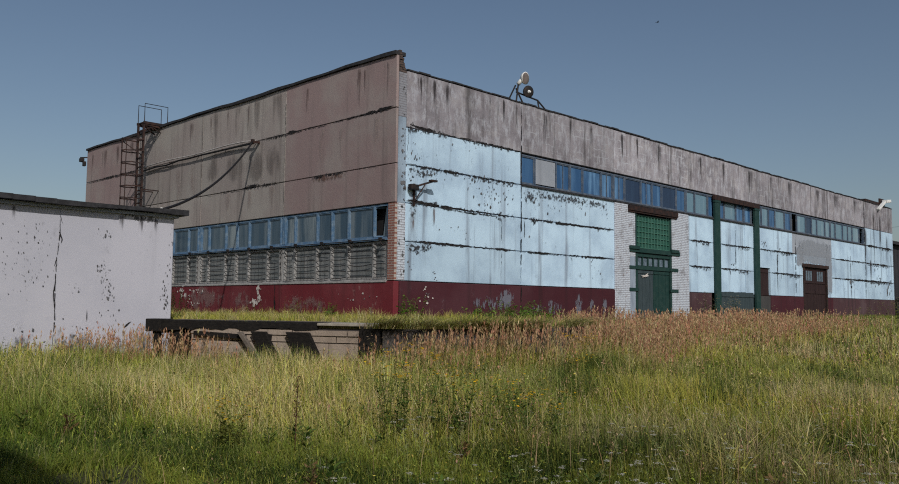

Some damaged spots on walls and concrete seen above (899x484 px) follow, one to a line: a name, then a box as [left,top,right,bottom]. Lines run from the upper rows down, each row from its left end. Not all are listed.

crack [52,213,63,344]
peeling [160,257,219,313]
spalling [236,283,261,309]